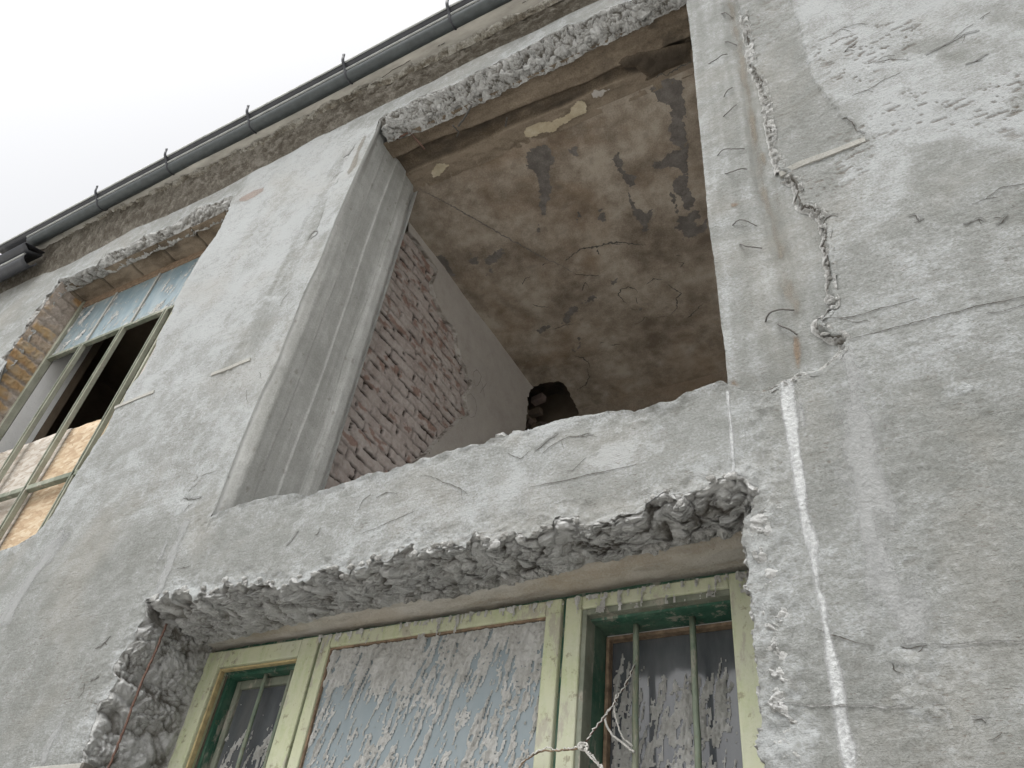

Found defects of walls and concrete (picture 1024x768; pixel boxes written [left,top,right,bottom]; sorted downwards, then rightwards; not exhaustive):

spalling [0,0,687,381]
spalling [325,231,472,489]
spalling [525,381,568,430]
crack [618,255,701,325]
spalling [81,471,782,768]
spalling [743,585,801,768]
leakage [781,380,856,768]